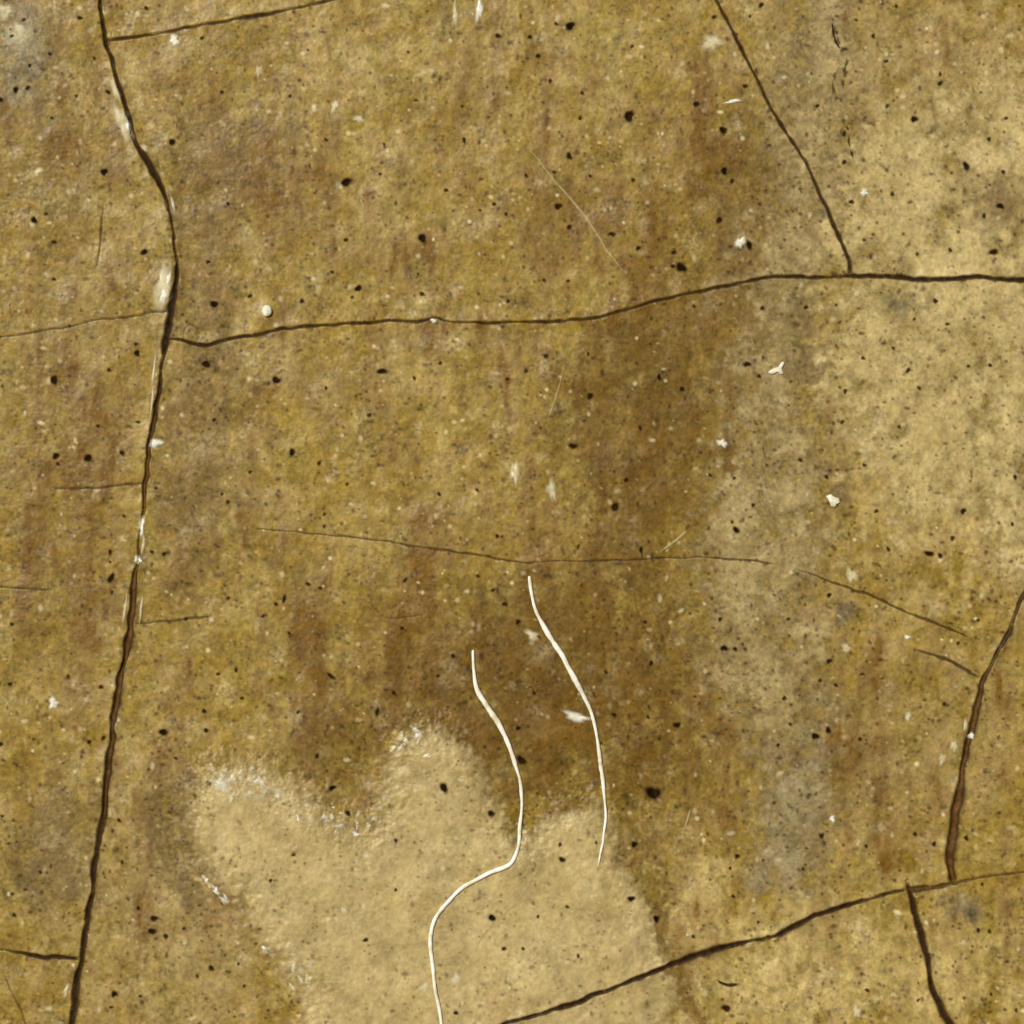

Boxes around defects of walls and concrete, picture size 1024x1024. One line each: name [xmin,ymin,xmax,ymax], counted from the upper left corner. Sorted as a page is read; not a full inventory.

crack [110,0,333,41]
crack [715,0,852,271]
crack [2,319,97,337]
crack [170,273,1024,348]
crack [58,0,179,1024]
crack [279,530,761,564]
crack [803,571,967,637]
crack [502,592,1024,1024]
crack [0,949,77,960]